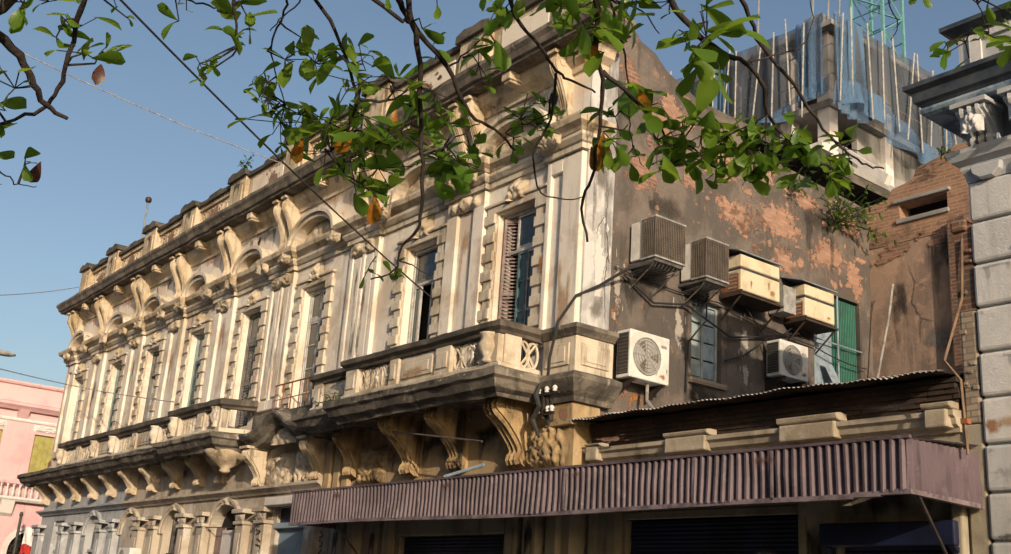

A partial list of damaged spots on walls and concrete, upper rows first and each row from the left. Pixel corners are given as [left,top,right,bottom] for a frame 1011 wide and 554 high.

spalling [624,89,704,216]
spalling [674,154,969,303]
peeling [673,294,686,350]
peeling [738,313,751,387]
leakage [894,285,906,314]
crack [910,268,934,342]
corrosion [986,419,1011,432]